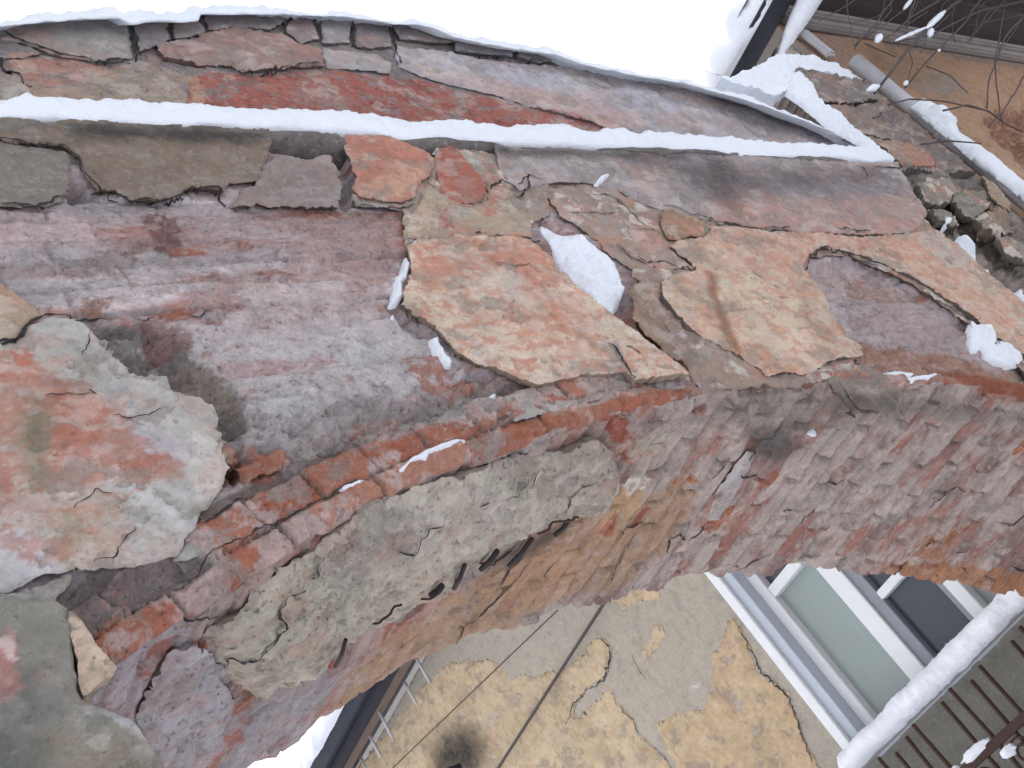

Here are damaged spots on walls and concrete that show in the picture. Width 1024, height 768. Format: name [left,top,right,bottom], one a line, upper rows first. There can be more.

crack [0,25,139,88]
crack [166,23,174,39]
crack [230,17,324,77]
crack [0,137,226,207]
peeling [0,78,1024,422]
crack [806,227,979,322]
crack [0,313,108,356]
crack [94,529,136,561]
crack [193,474,372,579]
crack [226,558,325,666]
peeling [611,588,661,612]
peeling [357,618,819,768]